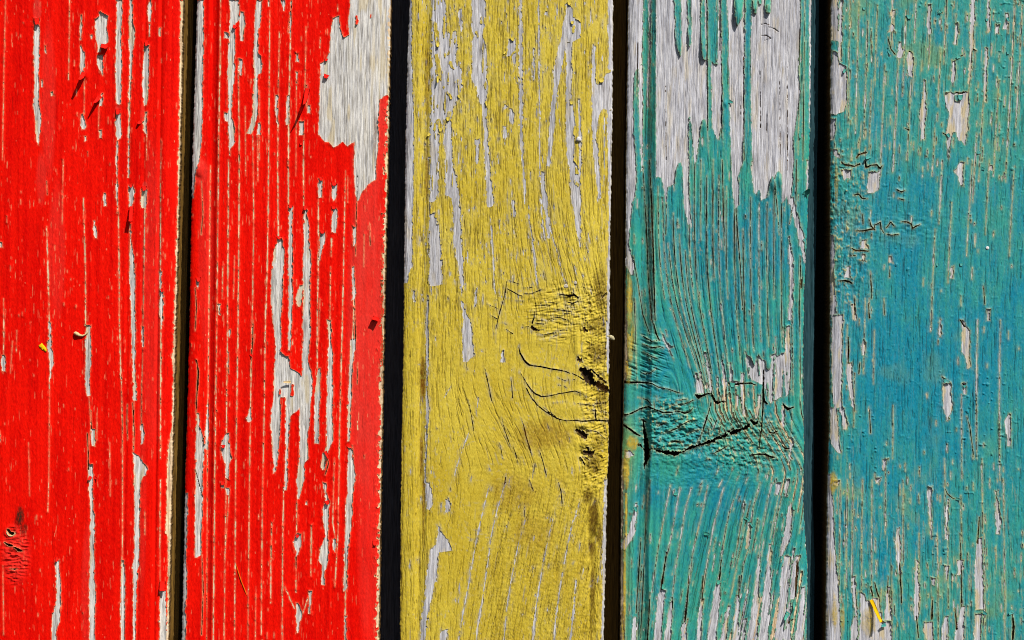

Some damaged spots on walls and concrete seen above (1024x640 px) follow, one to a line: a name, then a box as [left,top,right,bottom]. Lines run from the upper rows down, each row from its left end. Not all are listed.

peeling [78,12,108,80]
peeling [270,0,391,640]
peeling [404,0,416,302]
peeling [427,0,494,307]
peeling [547,0,613,393]
crack [444,0,805,640]
peeling [625,0,811,275]
peeling [830,0,851,180]
peeling [829,235,857,453]
crack [839,0,1023,384]
peeling [132,424,148,640]
peeling [826,474,841,640]